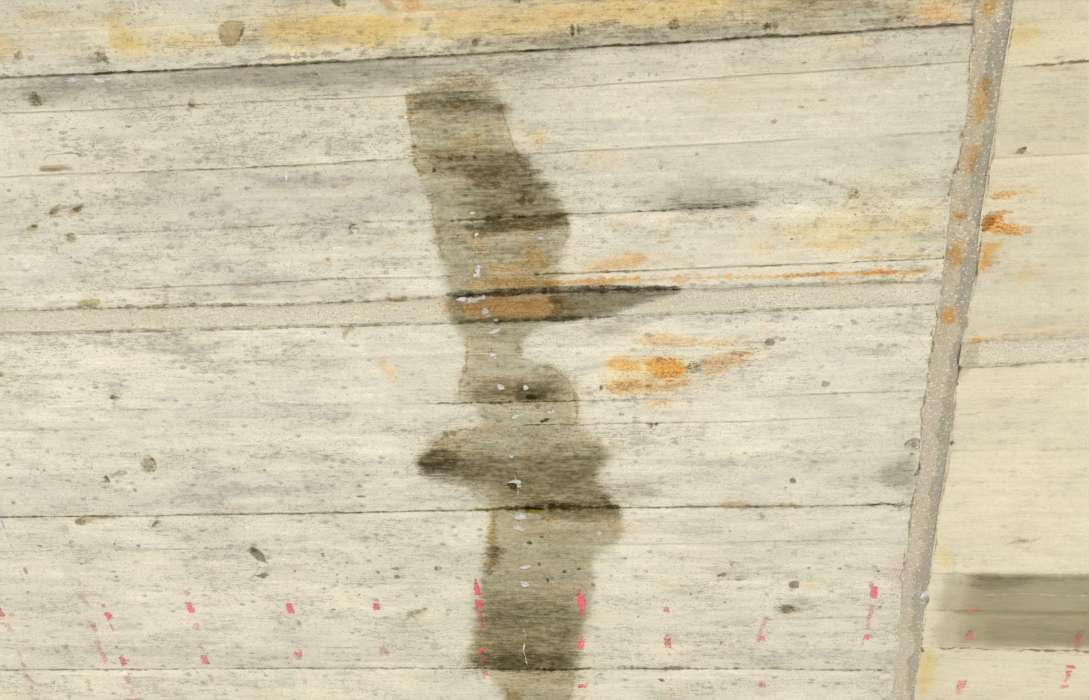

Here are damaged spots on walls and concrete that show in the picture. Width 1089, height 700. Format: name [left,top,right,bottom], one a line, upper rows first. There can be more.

water stain [457,289,526,334]
water stain [539,285,678,318]